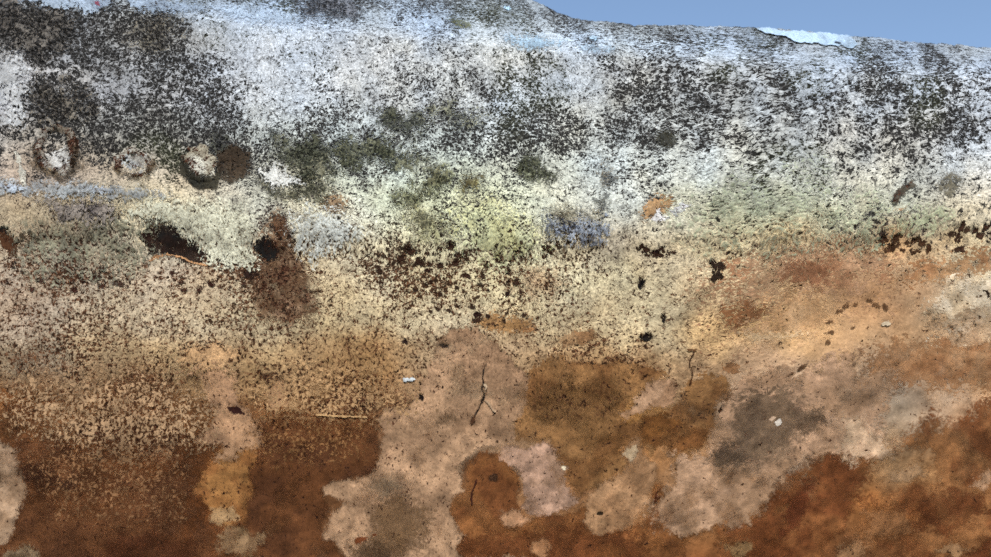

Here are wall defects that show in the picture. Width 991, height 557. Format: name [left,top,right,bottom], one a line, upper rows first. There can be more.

leakage [29,0,114,15]
leakage [0,51,36,131]
leakage [255,159,307,190]
spalling [0,225,32,273]
spalling [138,216,279,292]
rust [249,207,321,329]
leakage [284,200,368,270]
peeling [0,239,911,557]
rust [514,207,991,557]
rust [0,332,404,557]
rust [450,450,688,557]
peeling [935,543,962,557]